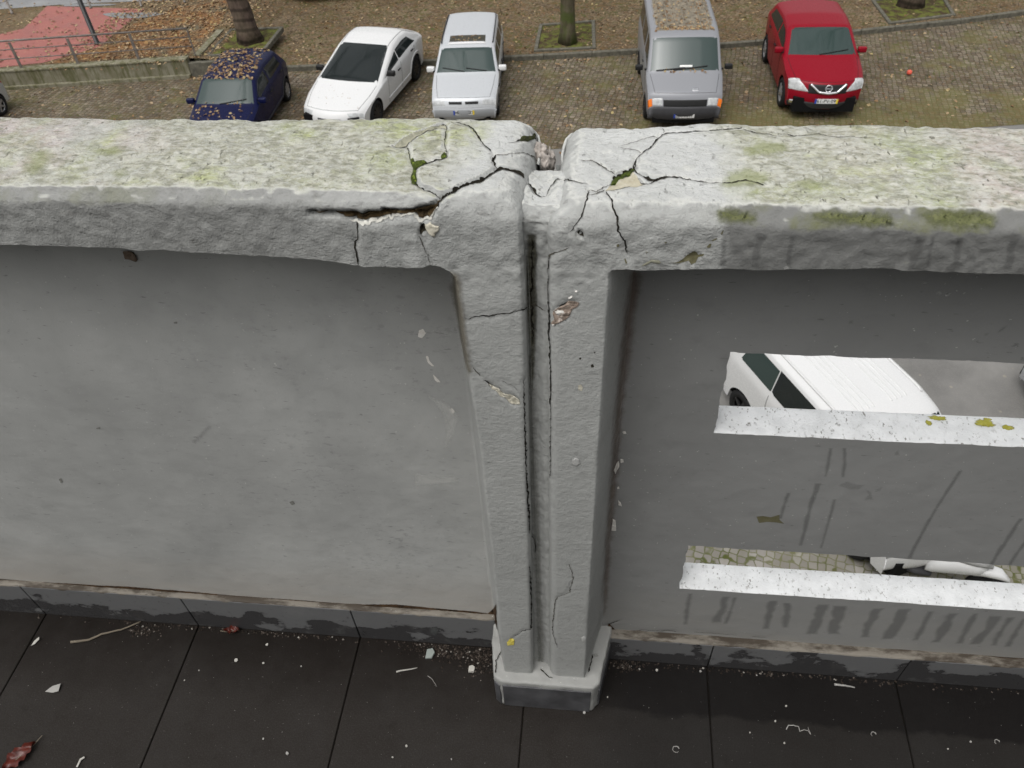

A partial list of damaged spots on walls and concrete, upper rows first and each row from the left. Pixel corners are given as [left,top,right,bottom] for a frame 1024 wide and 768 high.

spalling [510,133,556,171]
crack [352,217,360,263]
spalling [551,290,579,326]
crack [391,122,862,673]